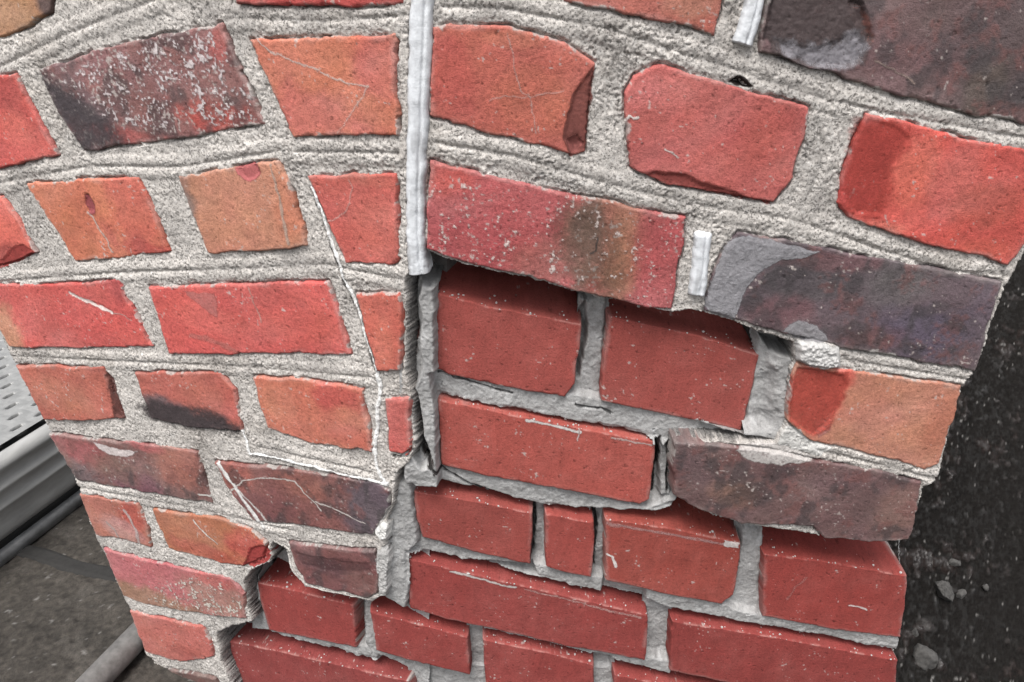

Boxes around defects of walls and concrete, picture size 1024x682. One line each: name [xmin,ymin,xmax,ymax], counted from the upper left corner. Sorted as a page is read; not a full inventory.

crack [230,186,486,525]